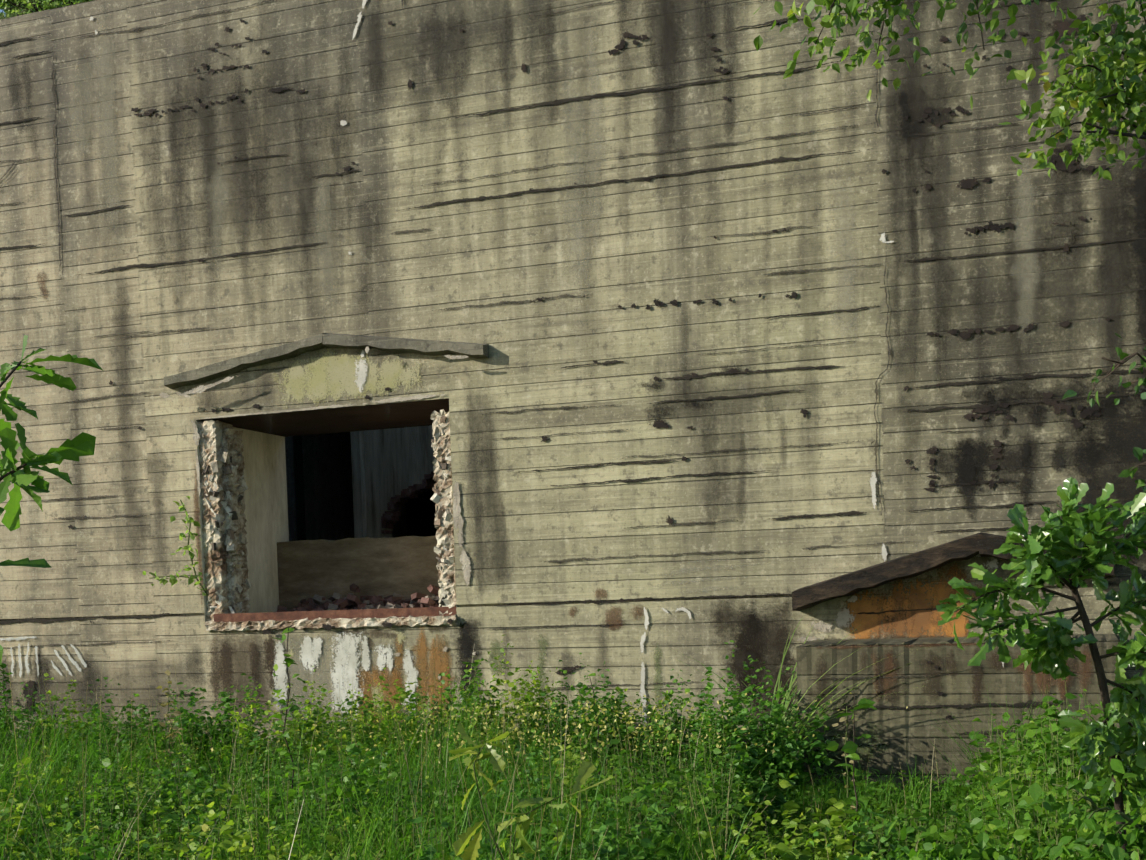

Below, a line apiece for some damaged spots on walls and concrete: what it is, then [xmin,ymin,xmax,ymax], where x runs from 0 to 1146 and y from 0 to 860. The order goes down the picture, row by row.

crack [482,231,1146,550]
flaking render [191,387,445,613]
spalling [381,416,472,607]
crack [544,519,766,564]
leakage [952,438,989,519]
leakage [1052,388,1146,563]
rust [819,563,982,649]
peeling [262,629,288,710]
peeling [299,624,419,729]
rust [344,625,455,733]
leakage [711,596,799,731]
leakage [972,650,1007,704]